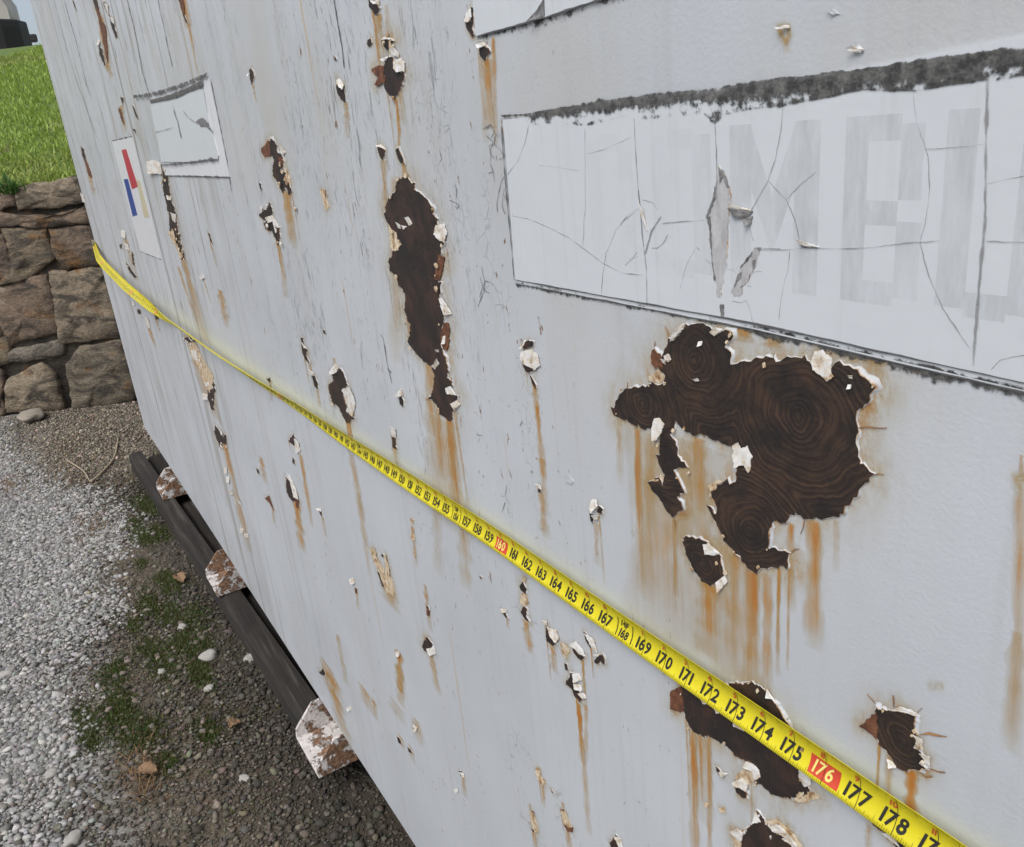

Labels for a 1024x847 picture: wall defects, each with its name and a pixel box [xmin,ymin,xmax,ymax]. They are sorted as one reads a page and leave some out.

rust [519,340,540,442]
rust [611,322,886,664]
rust [519,576,607,753]